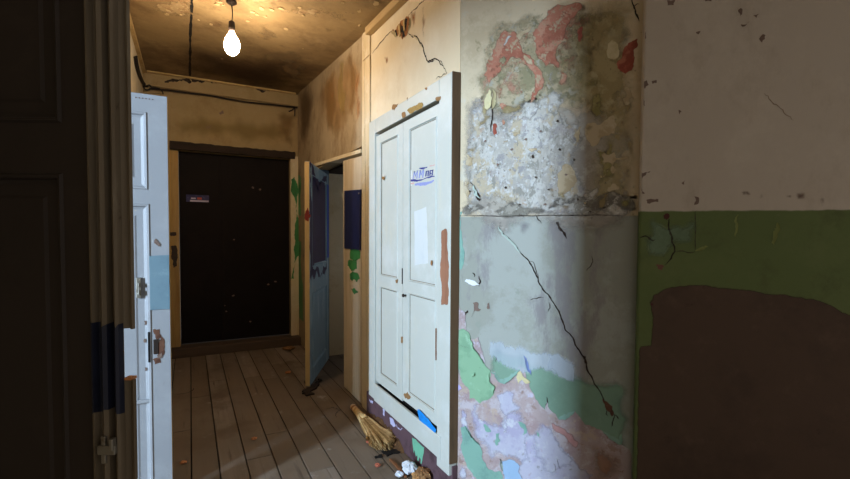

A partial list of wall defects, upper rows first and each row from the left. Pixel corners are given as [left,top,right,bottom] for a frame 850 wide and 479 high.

crack [372,2,447,79]
peeling [464,2,658,231]
crack [465,215,620,426]
peeling [458,285,850,479]